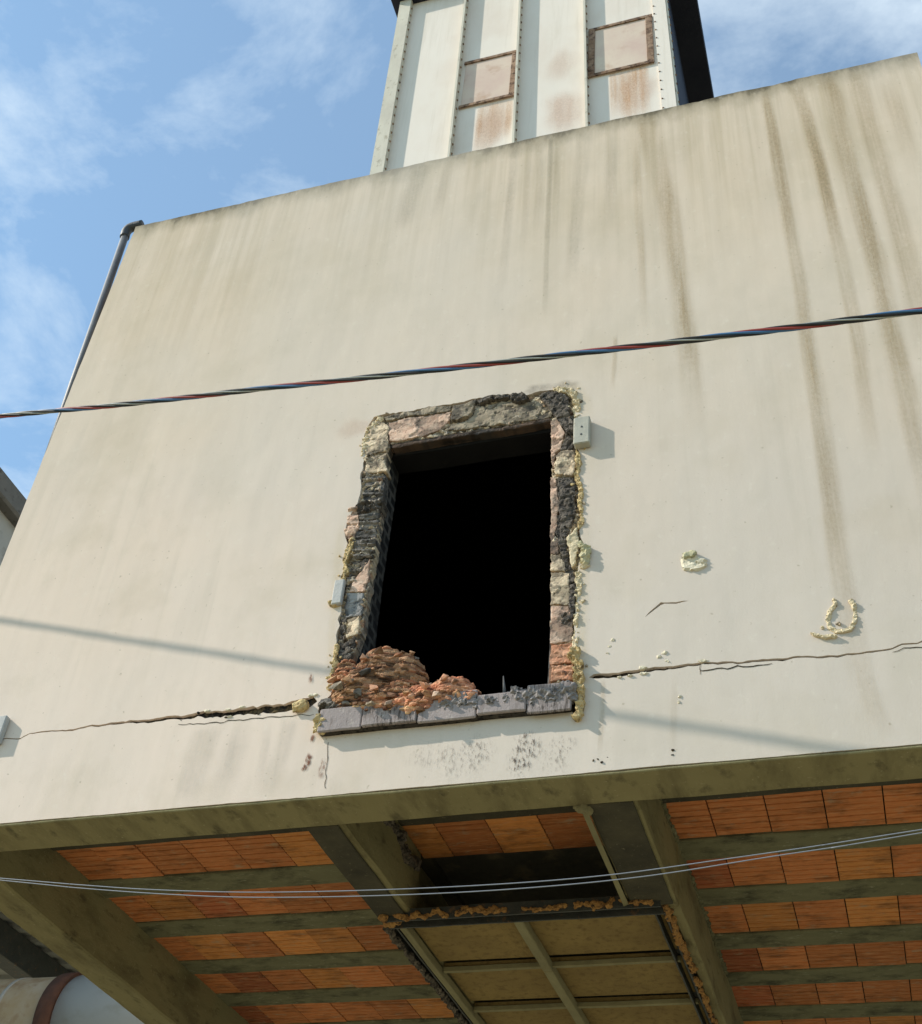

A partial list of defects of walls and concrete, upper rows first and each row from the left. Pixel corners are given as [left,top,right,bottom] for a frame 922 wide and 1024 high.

spalling [325,382,588,684]
crack [593,659,785,679]
crack [98,693,318,727]